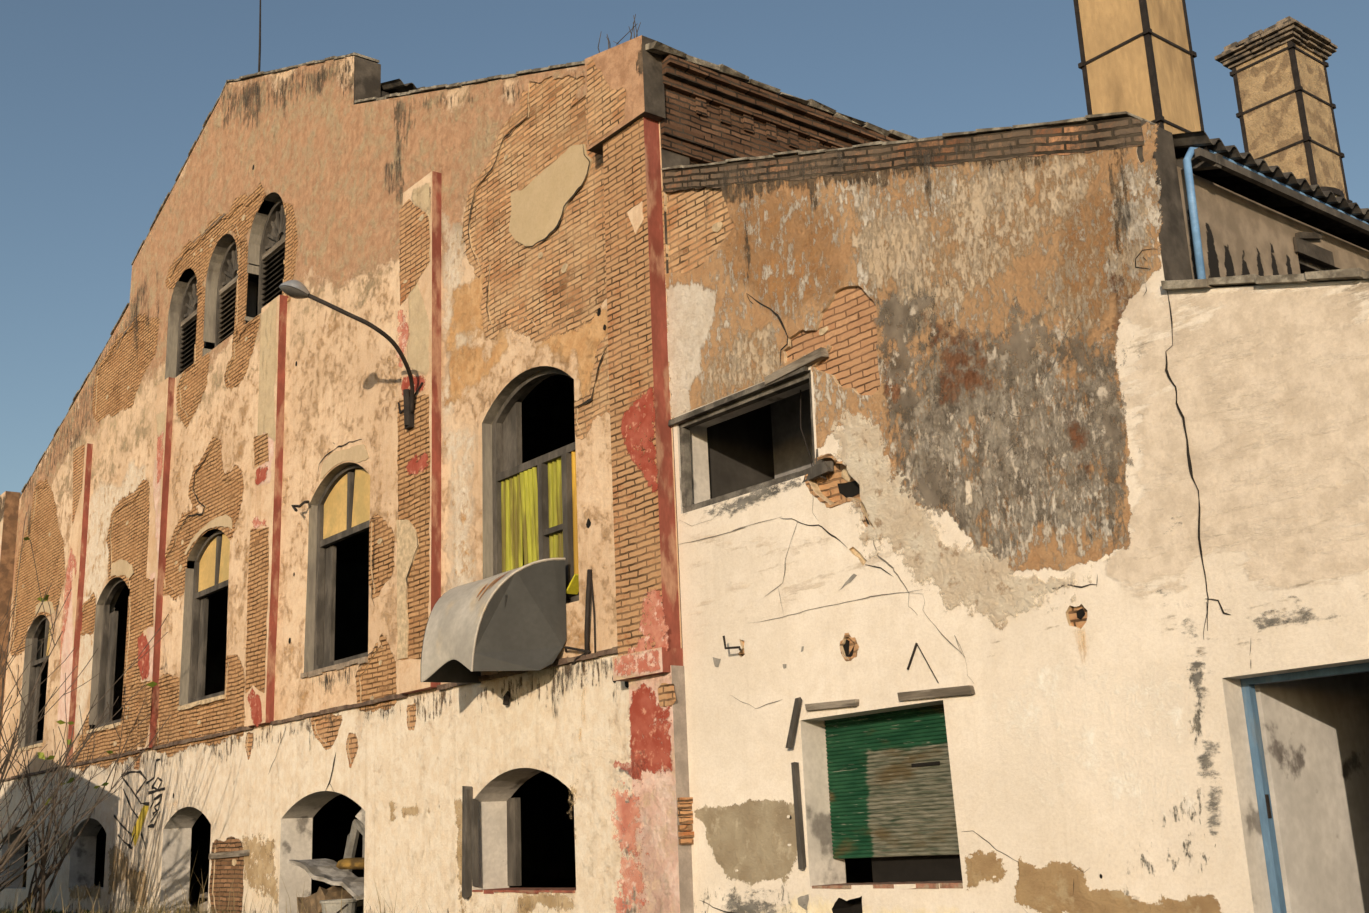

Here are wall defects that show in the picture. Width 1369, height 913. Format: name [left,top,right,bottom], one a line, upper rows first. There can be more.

spalling [462,57,626,343]
spalling [92,313,160,423]
peeling [574,122,1163,572]
crack [1135,249,1231,638]
spalling [10,444,96,659]
spalling [72,431,269,771]
crack [678,492,973,682]
spalling [840,548,867,590]
peeling [677,797,797,886]
spalling [797,894,809,911]
peeling [965,850,1221,913]